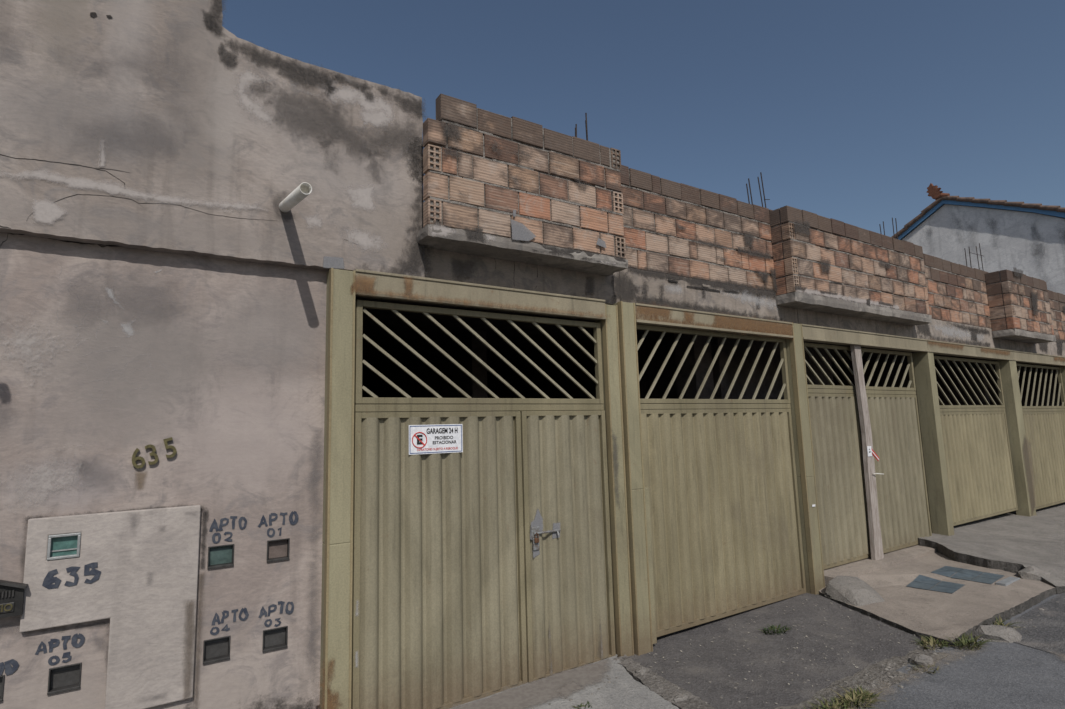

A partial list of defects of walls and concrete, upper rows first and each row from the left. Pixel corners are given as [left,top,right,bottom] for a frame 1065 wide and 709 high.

damp [204,0,495,277]
peeling [33,201,64,224]
peeling [5,171,262,209]
crack [0,154,275,247]
corrosion [636,306,793,336]